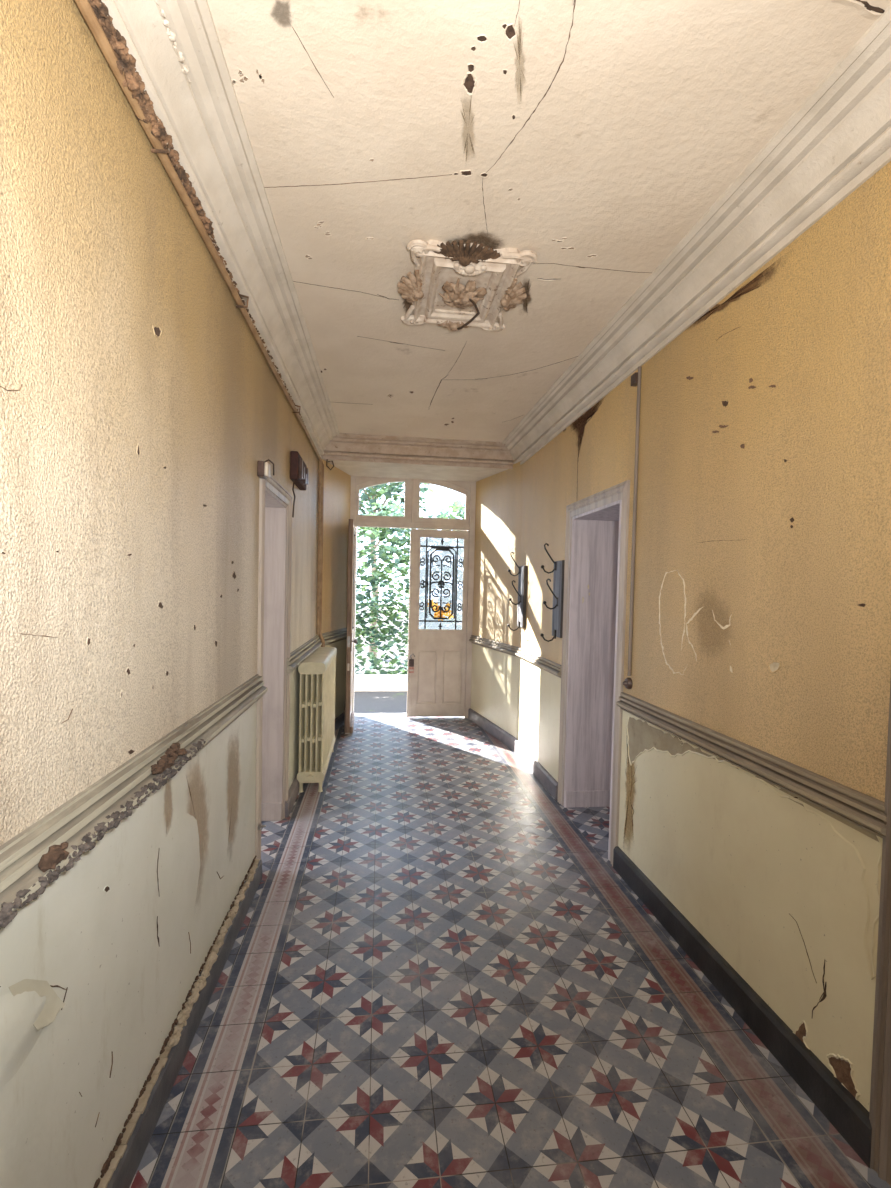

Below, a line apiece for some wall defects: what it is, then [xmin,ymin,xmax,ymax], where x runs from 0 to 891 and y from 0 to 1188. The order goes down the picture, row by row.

crack [831,0,885,20]
flaking render [88,0,214,236]
crack [482,0,576,235]
crack [264,174,452,188]
crack [537,263,649,282]
crack [357,336,578,410]
flaking render [0,739,206,929]
peeling [627,715,883,980]
peeling [9,979,65,1031]
crack [792,917,827,1041]